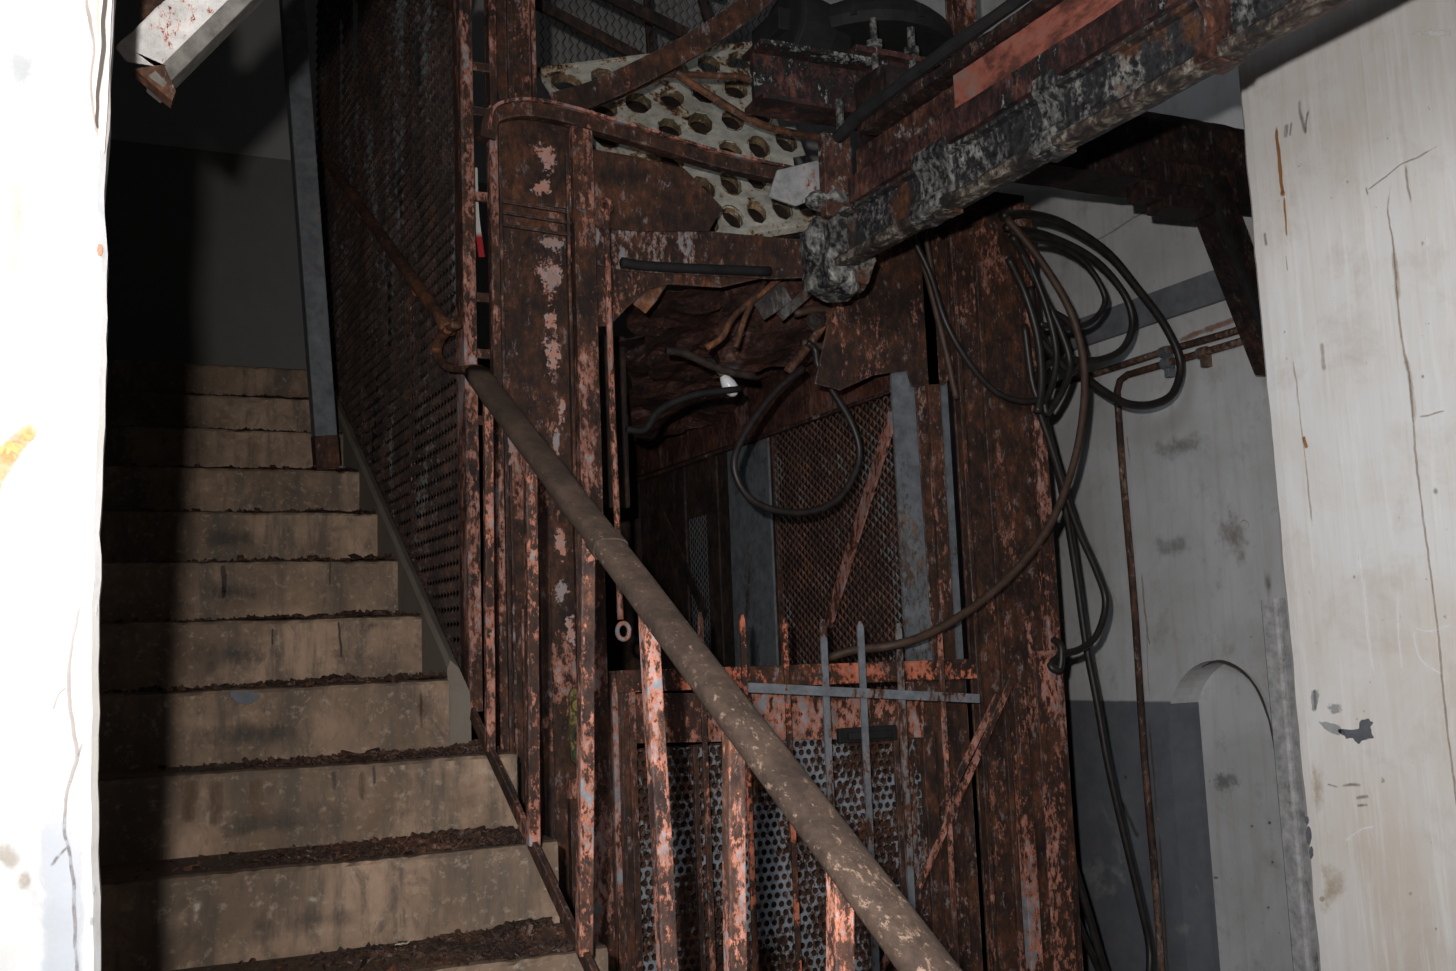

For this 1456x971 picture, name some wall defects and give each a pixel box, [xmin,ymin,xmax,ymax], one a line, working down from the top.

rust [1275,129,1287,235]
peeling [1311,690,1374,744]